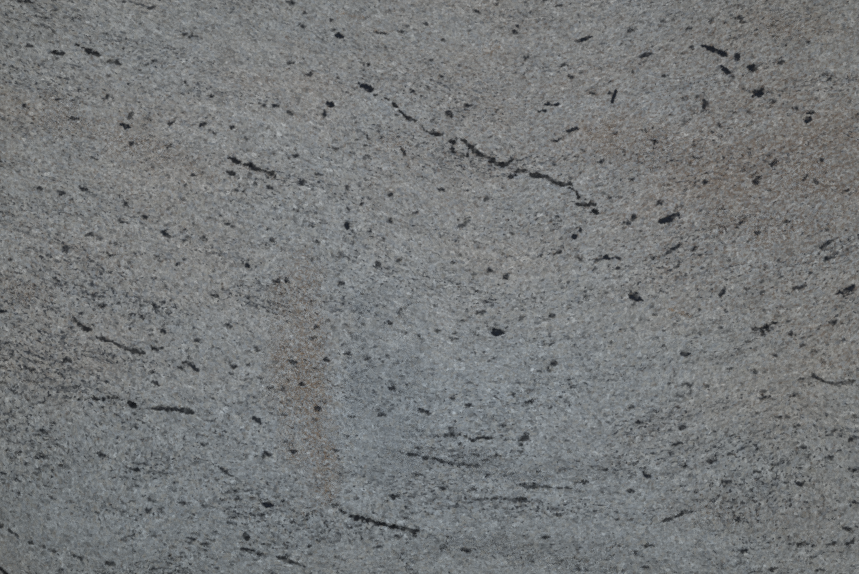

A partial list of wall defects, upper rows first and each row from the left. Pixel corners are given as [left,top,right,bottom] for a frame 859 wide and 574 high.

crack [373,94,599,215]